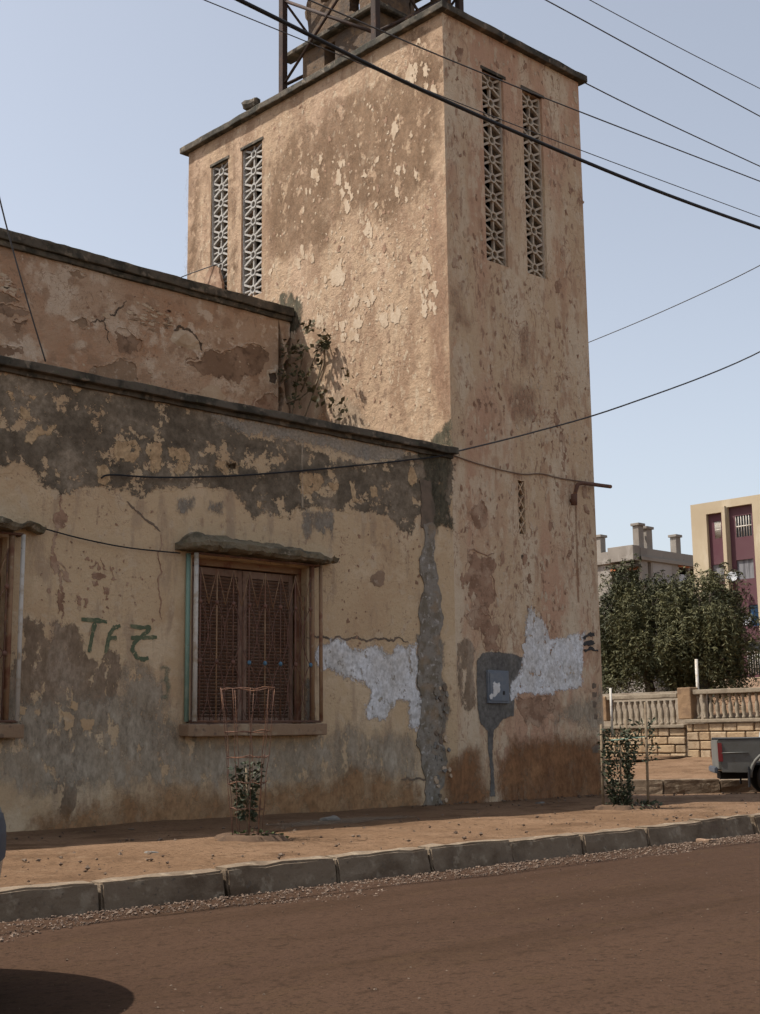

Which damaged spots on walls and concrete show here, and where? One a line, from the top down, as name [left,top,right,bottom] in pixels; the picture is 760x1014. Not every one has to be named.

spalling [70,289,200,384]
spalling [182,325,279,410]
damp [0,371,456,538]
spalling [458,349,594,653]
corrosion [2,535,15,720]